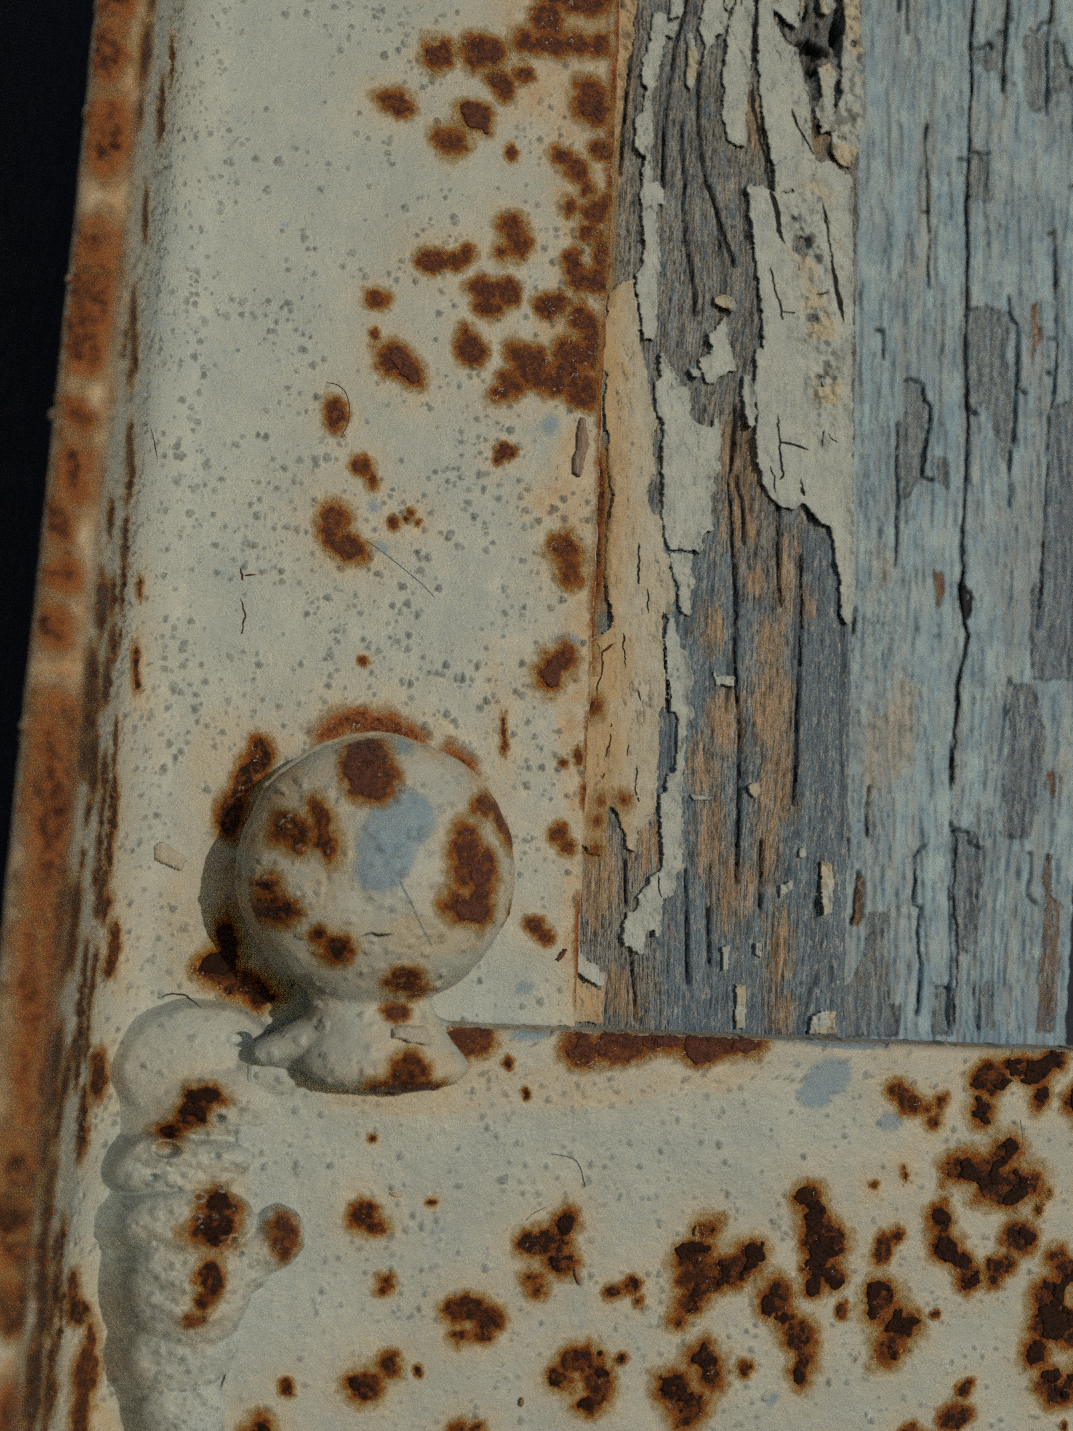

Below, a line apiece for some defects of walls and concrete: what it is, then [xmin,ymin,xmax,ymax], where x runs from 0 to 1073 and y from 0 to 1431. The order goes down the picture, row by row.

rust [413,0,635,859]
peeling [556,0,864,954]
crack [731,0,1073,789]
rust [0,185,149,1431]
rust [212,705,581,1005]
peeling [575,948,607,1024]
peeling [721,945,730,971]
peeling [734,984,746,1029]
crack [847,787,869,921]
crack [911,799,1005,1027]
rust [648,1178,941,1431]
rust [882,1046,1073,1431]